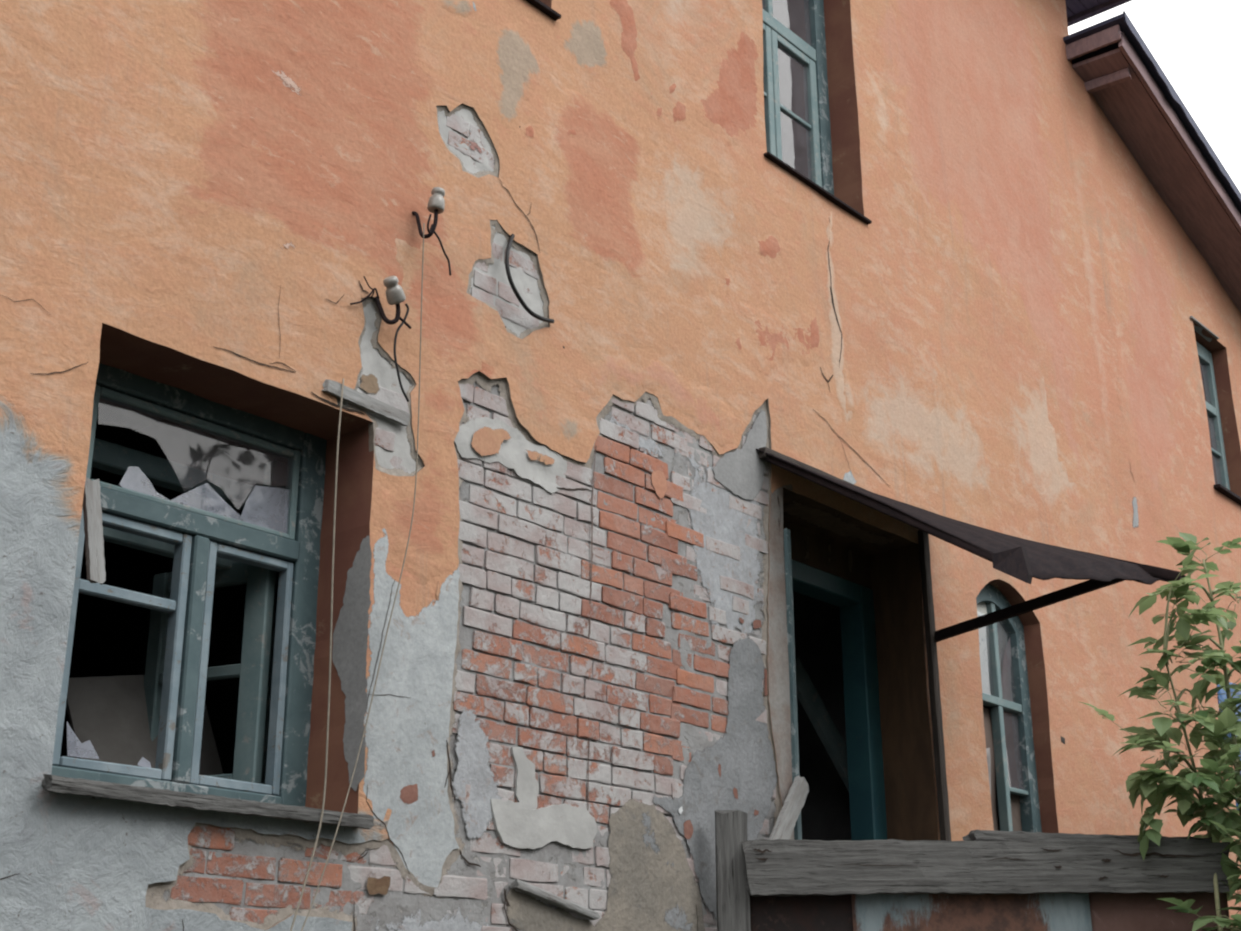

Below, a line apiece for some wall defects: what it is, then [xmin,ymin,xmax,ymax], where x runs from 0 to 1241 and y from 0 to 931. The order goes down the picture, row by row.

spalling [436,104,499,178]
flaking render [492,22,541,139]
flaking render [563,0,640,82]
peeling [647,24,763,147]
spalling [467,220,549,339]
crack [213,286,365,415]
spalling [336,297,423,476]
flaking render [458,372,544,446]
crack [813,219,888,485]
flaking render [0,387,793,931]